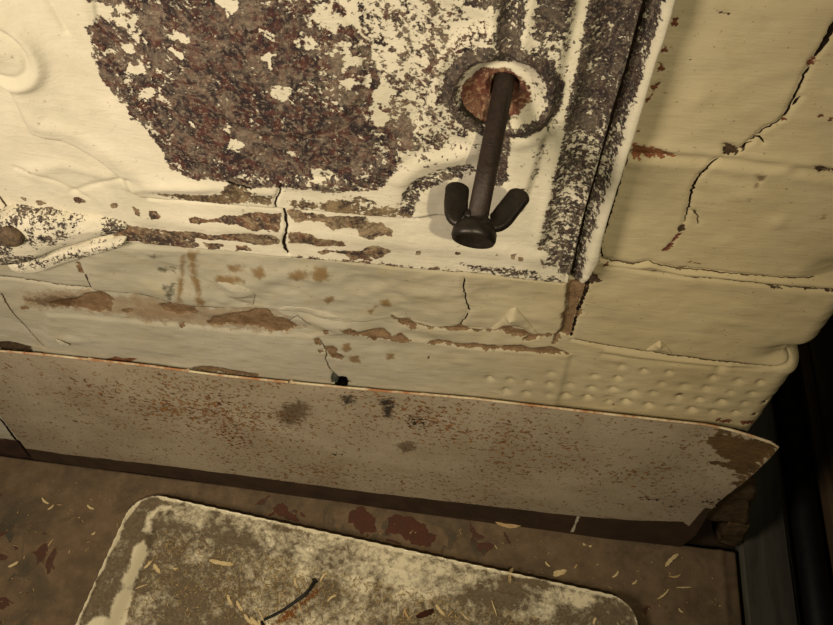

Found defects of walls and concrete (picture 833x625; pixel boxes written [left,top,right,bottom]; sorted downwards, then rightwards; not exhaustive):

rust [460,66,531,122]
crack [739,22,833,148]
peeling [0,0,679,360]
crack [274,183,289,253]
peeling [662,224,685,251]
crack [460,278,470,324]